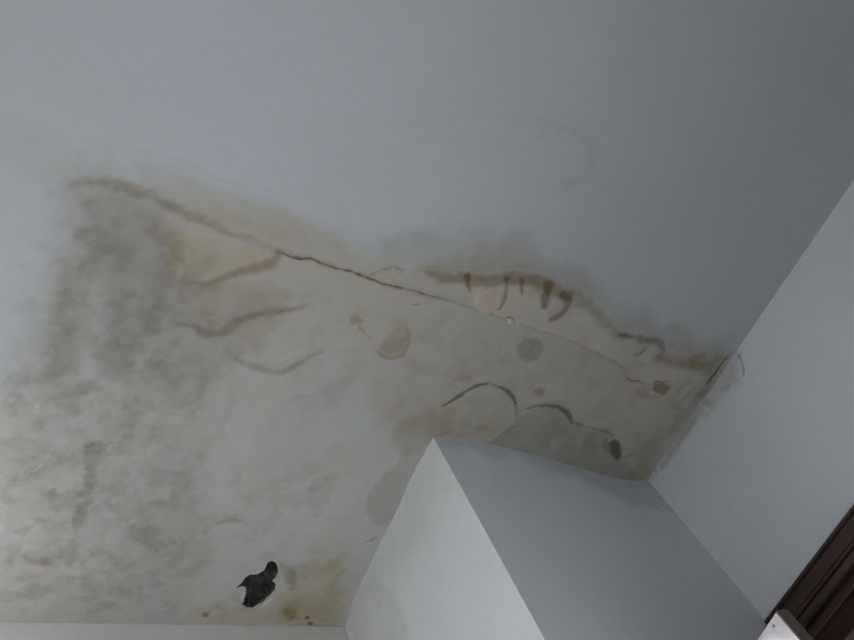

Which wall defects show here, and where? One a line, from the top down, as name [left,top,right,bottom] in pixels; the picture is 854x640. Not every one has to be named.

crack [271,245,492,317]
damp [0,97,746,640]
flaking render [374,322,415,363]
spalling [237,561,278,610]